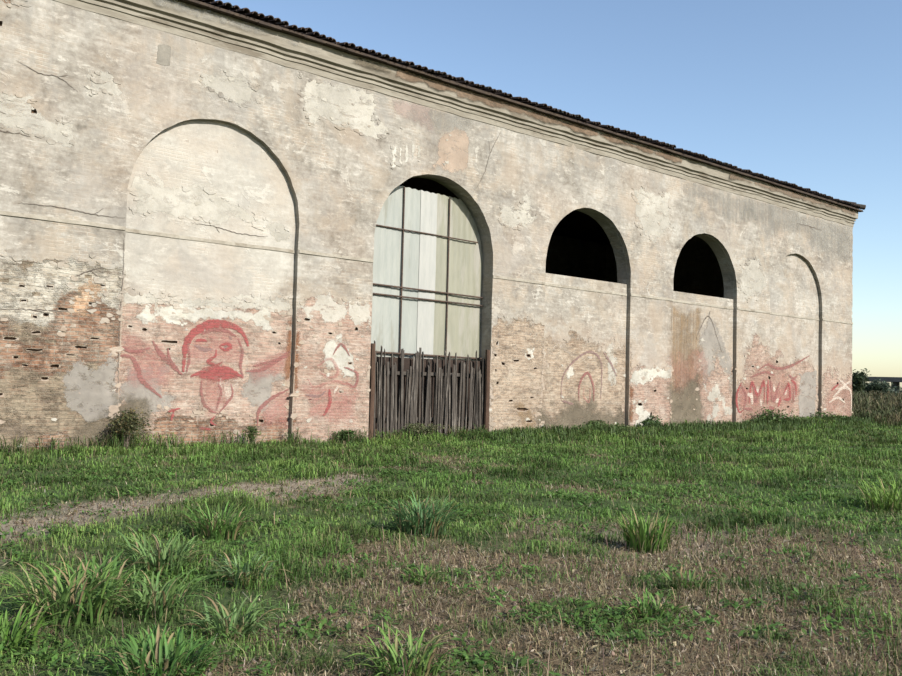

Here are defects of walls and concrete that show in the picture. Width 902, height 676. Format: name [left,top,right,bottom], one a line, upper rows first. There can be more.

flaking render [298,71,421,169]
flaking render [432,126,469,173]
flaking render [0,253,372,452]
flaking render [489,314,674,432]
leakage [670,308,702,426]
flaking render [713,334,853,422]